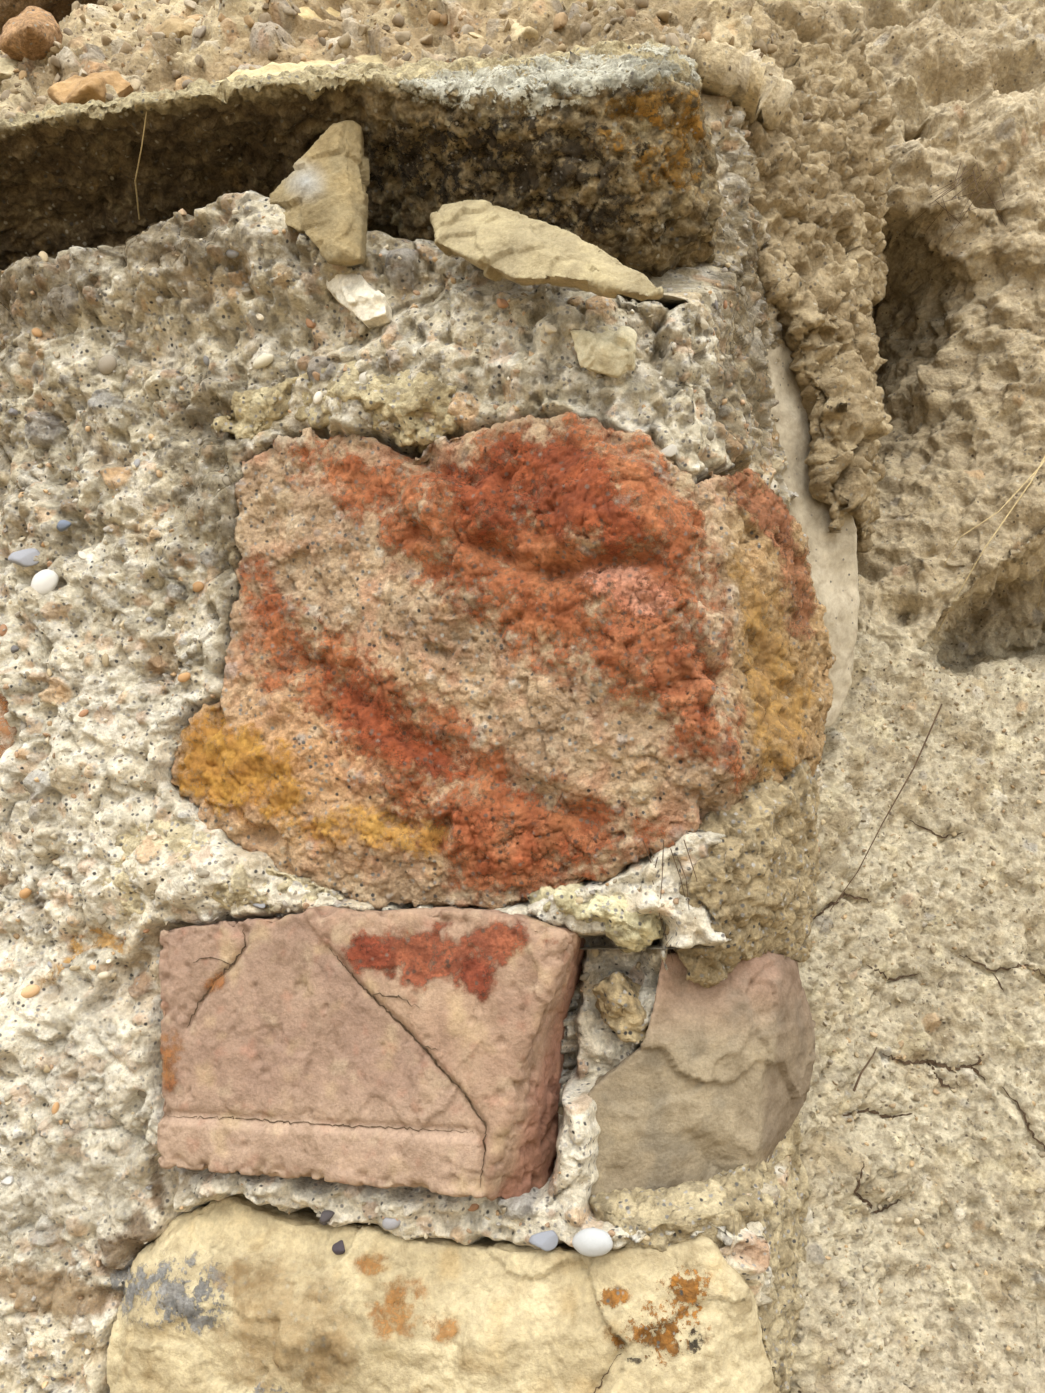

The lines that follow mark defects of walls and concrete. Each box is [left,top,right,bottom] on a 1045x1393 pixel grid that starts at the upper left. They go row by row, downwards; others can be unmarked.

crack [867,965,919,981]
crack [959,955,1045,992]
crack [843,1108,912,1120]
crack [883,1053,1045,1150]
crack [854,1163,901,1214]